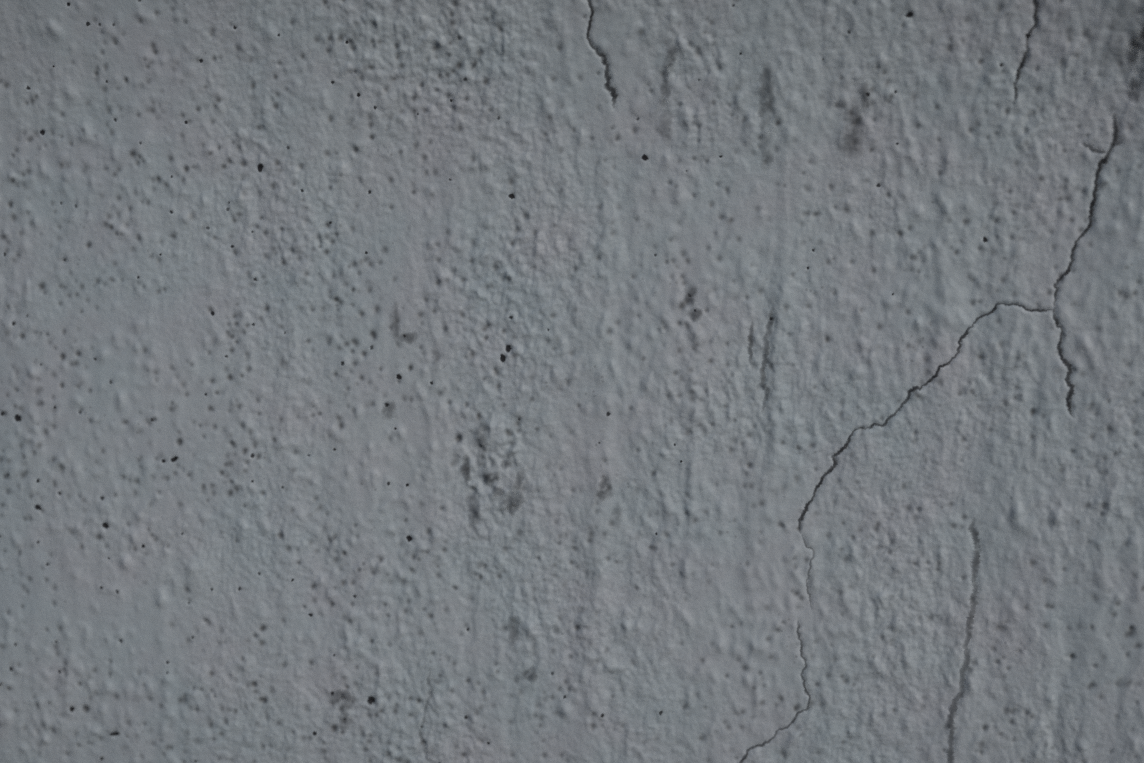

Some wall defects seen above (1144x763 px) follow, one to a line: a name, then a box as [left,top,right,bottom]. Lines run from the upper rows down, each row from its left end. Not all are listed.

crack [587,0,617,100]
crack [799,120,1119,524]